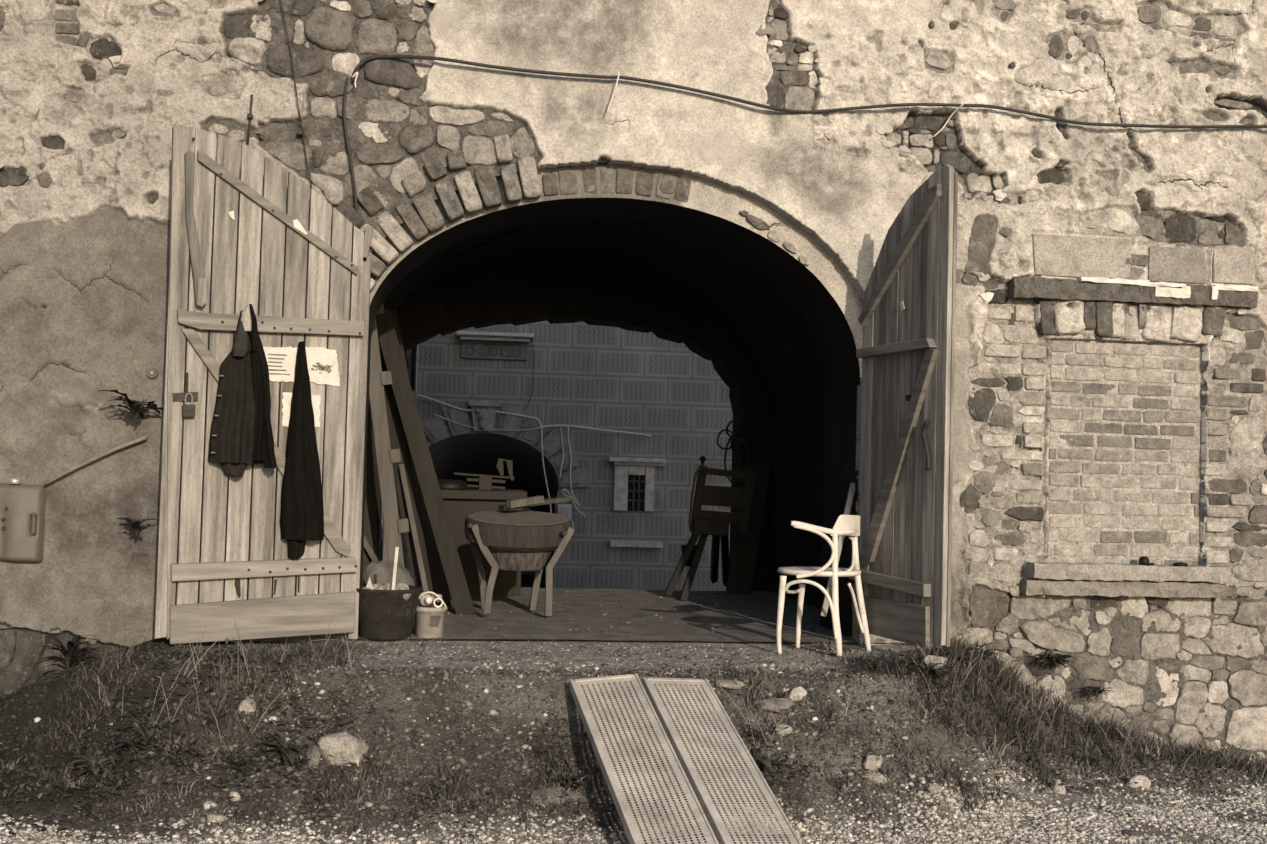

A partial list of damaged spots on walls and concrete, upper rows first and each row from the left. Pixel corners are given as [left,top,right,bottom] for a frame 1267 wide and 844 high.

spalling [52,2,130,81]
spalling [755,0,829,114]
spalling [202,0,541,238]
spalling [876,112,1023,205]
spalling [1055,107,1067,139]
spalling [1126,134,1151,172]
spalling [1078,191,1243,247]
crack [0,260,148,303]
flaking render [953,270,1050,609]
flaking render [1201,307,1267,600]